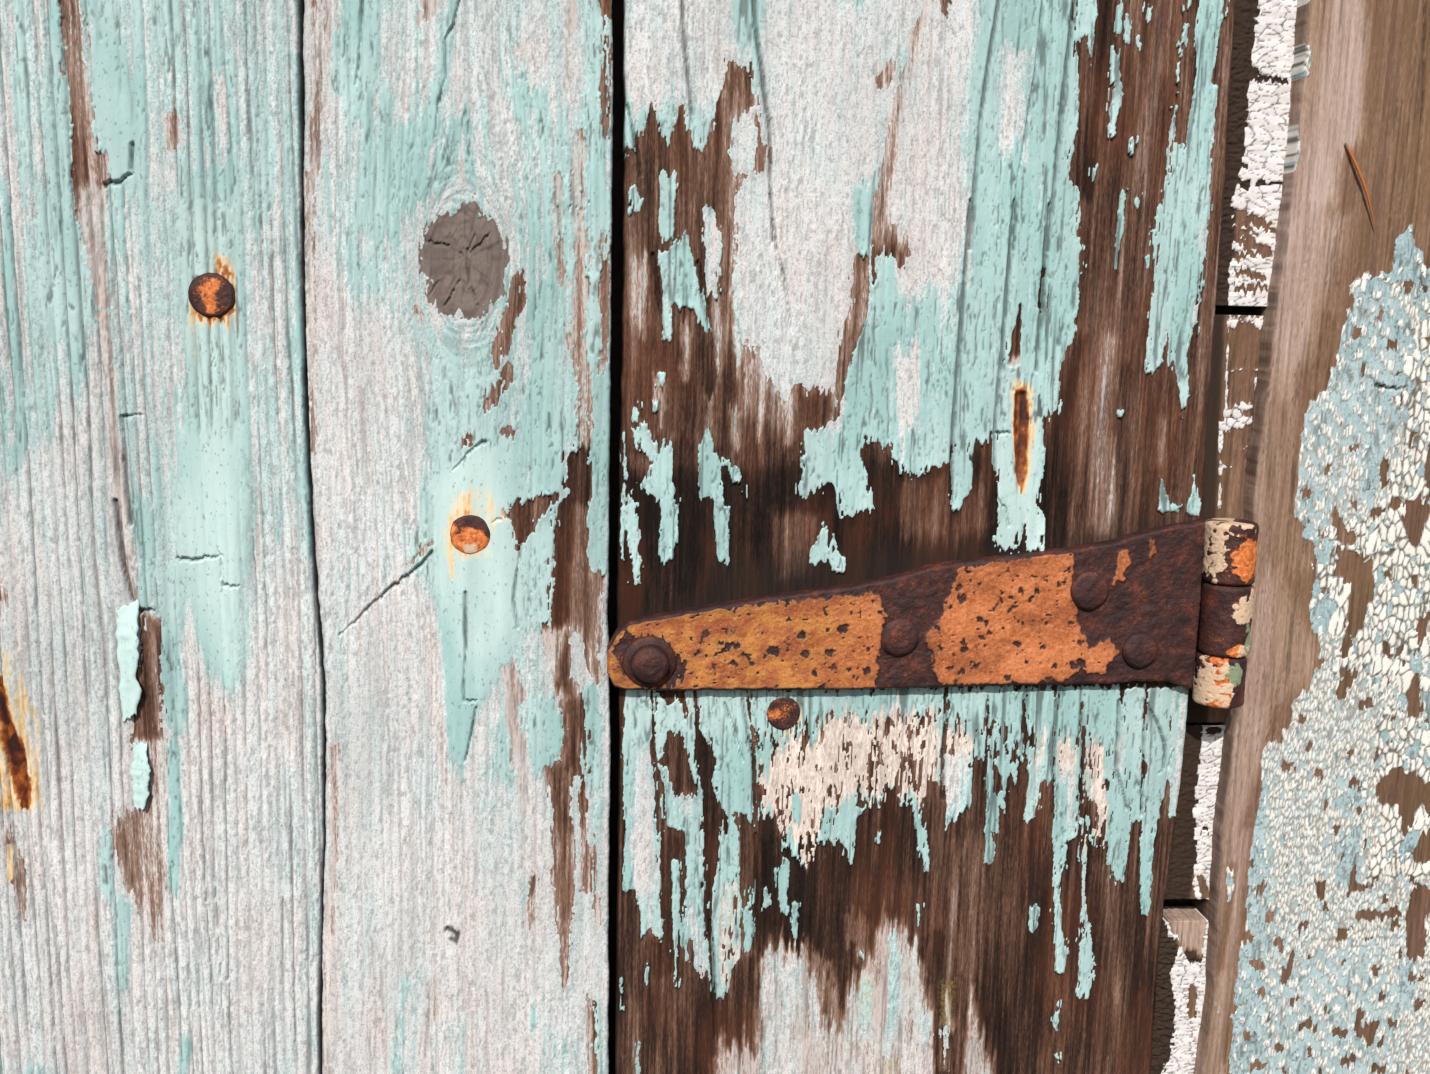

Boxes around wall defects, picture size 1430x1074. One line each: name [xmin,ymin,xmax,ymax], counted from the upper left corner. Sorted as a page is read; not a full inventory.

rust [187,249,242,356]
peeling [483,269,528,415]
peeling [1036,0,1235,537]
peeling [59,0,172,944]
rust [442,480,510,582]
peeling [500,0,1176,1074]
rust [1009,373,1042,497]
peeling [1192,0,1430,1074]
rust [0,640,49,817]
rust [0,843,16,888]
peeling [421,974,447,1074]